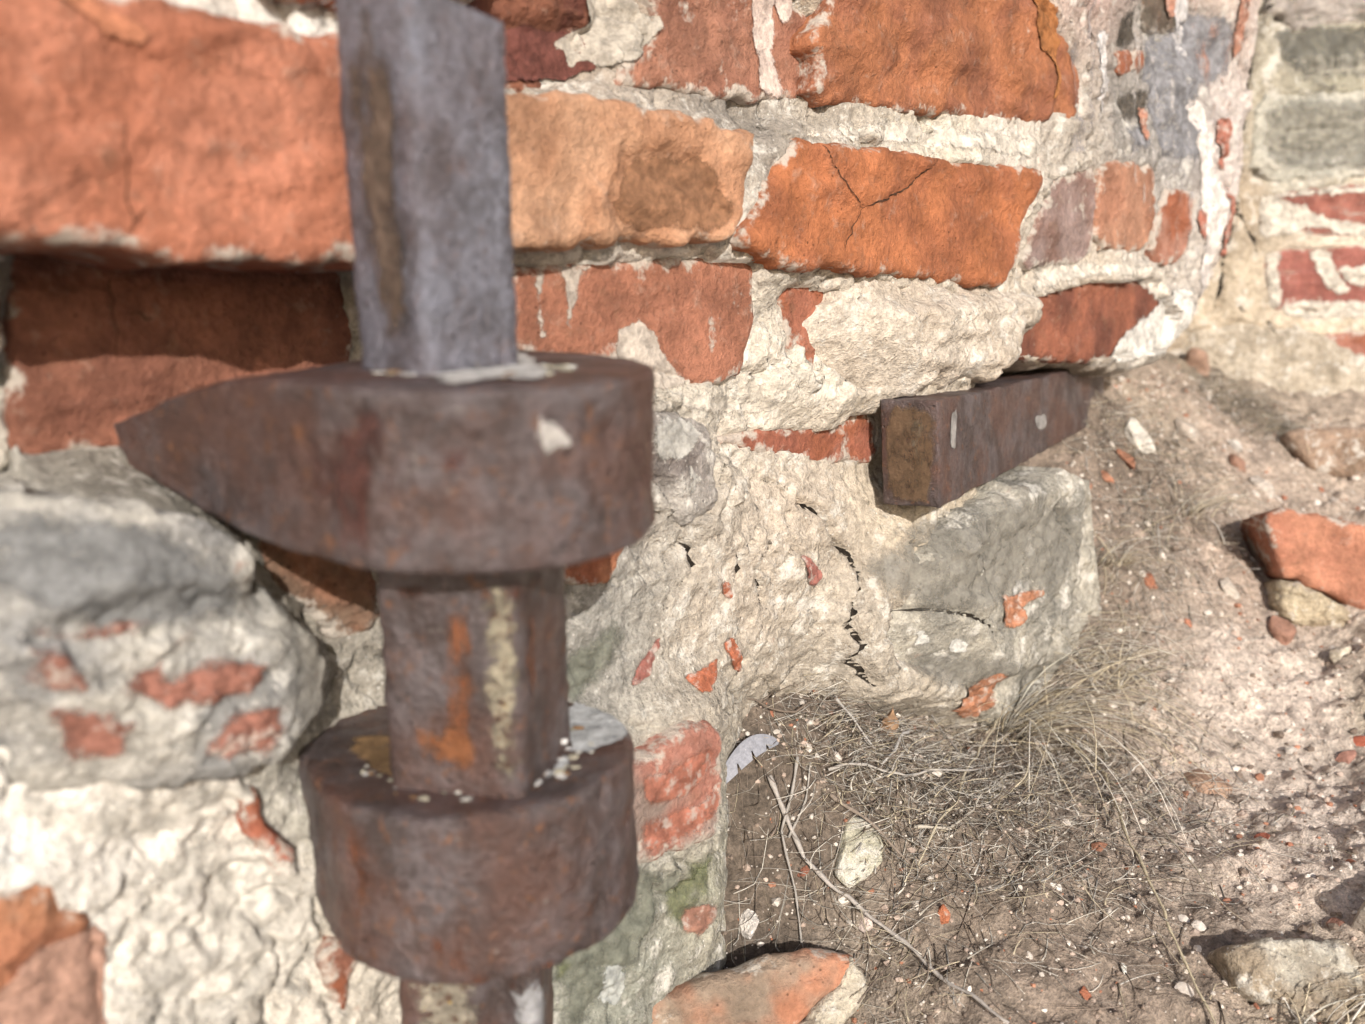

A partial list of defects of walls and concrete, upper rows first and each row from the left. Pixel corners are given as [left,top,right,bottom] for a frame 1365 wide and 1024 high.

corrosion [348,11,406,335]
crack [818,143,938,248]
crack [795,503,817,515]
crack [834,546,876,687]
crack [891,608,997,646]
corrosion [419,615,472,768]
corrosion [350,735,391,774]